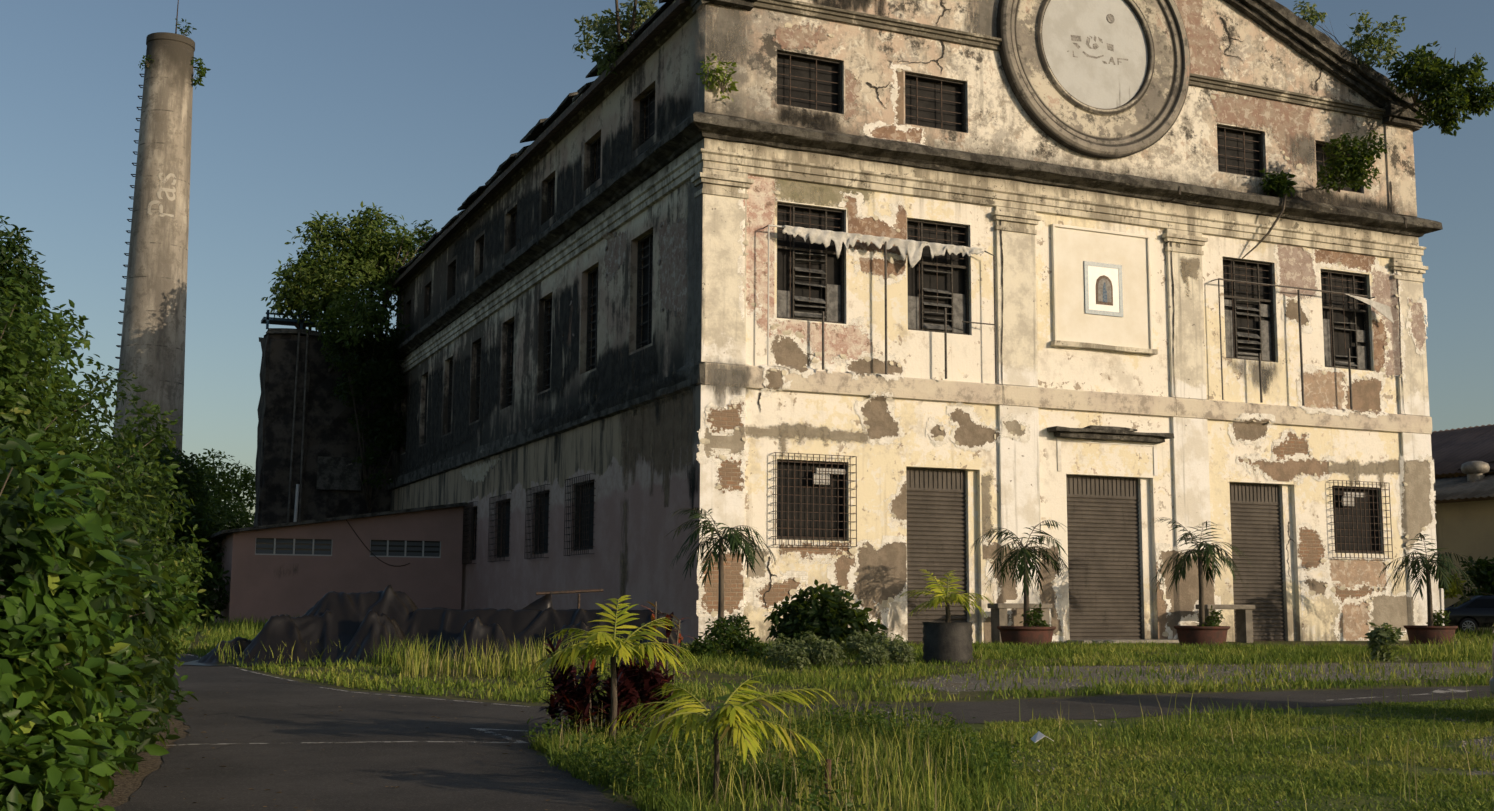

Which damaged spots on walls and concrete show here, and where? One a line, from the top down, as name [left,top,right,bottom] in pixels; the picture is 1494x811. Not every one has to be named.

water stain [813,0,886,17]
water stain [452,96,690,279]
water stain [397,345,501,476]
water stain [532,183,749,610]
peeling [696,175,908,499]
spalling [925,401,1030,452]
spalling [1228,412,1336,485]
peeling [1273,244,1428,418]
spalling [696,476,907,631]
spalling [1297,454,1437,641]